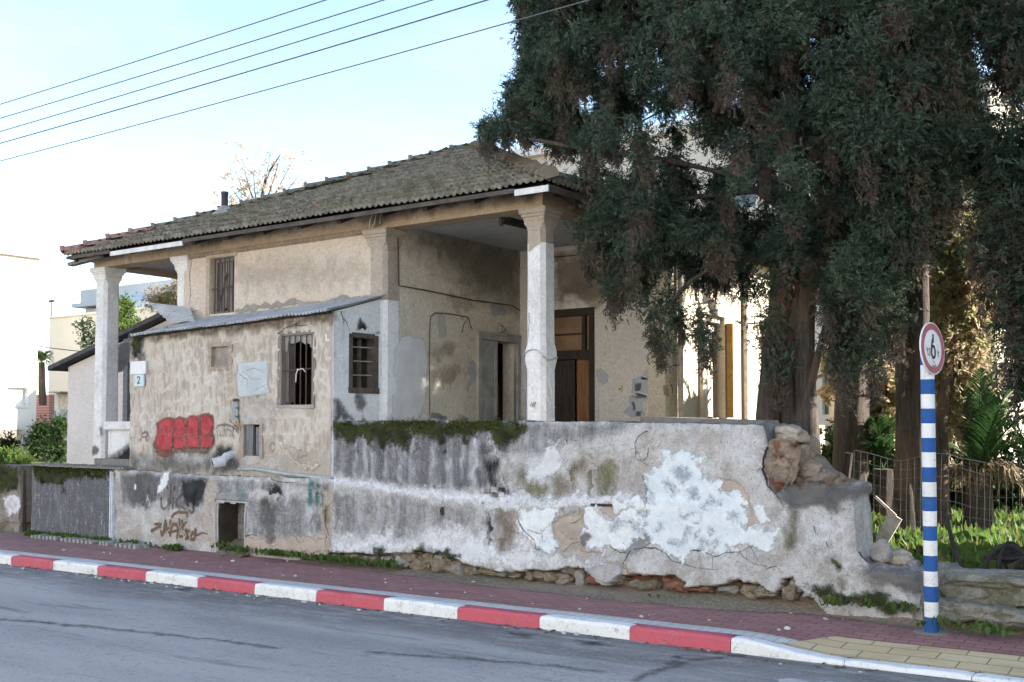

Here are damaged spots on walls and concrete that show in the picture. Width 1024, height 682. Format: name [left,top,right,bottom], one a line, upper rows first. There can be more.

peeling [624,369,648,417]
leakage [109,446,211,510]
leakage [260,484,289,543]
leakage [332,394,365,462]
leakage [332,438,635,574]
peeling [510,442,780,574]
spalling [762,424,846,491]
crack [611,546,783,573]